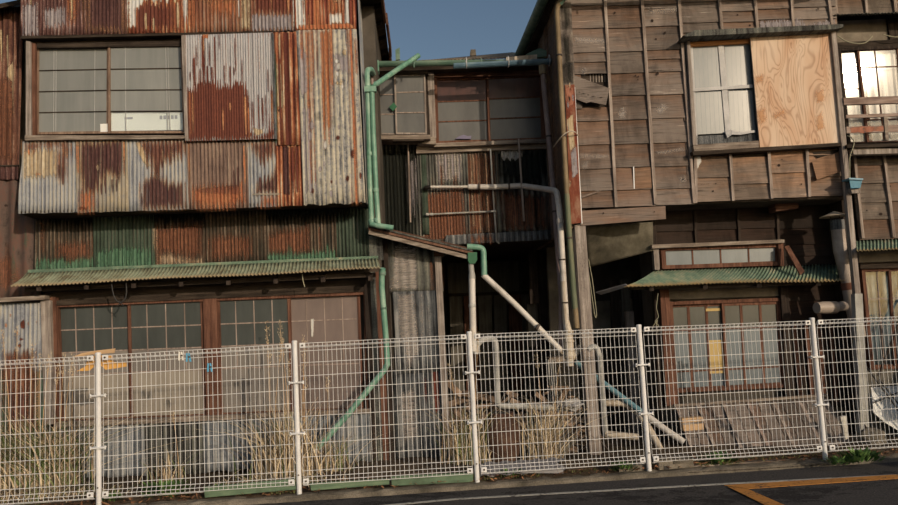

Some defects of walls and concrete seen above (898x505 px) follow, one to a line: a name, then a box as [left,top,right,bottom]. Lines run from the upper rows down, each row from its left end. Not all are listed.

rust [0,30,13,97]
rust [68,0,362,211]
rust [24,140,125,211]
rust [425,153,547,243]
rust [154,223,252,265]
rust [269,227,320,255]
rust [0,320,39,431]